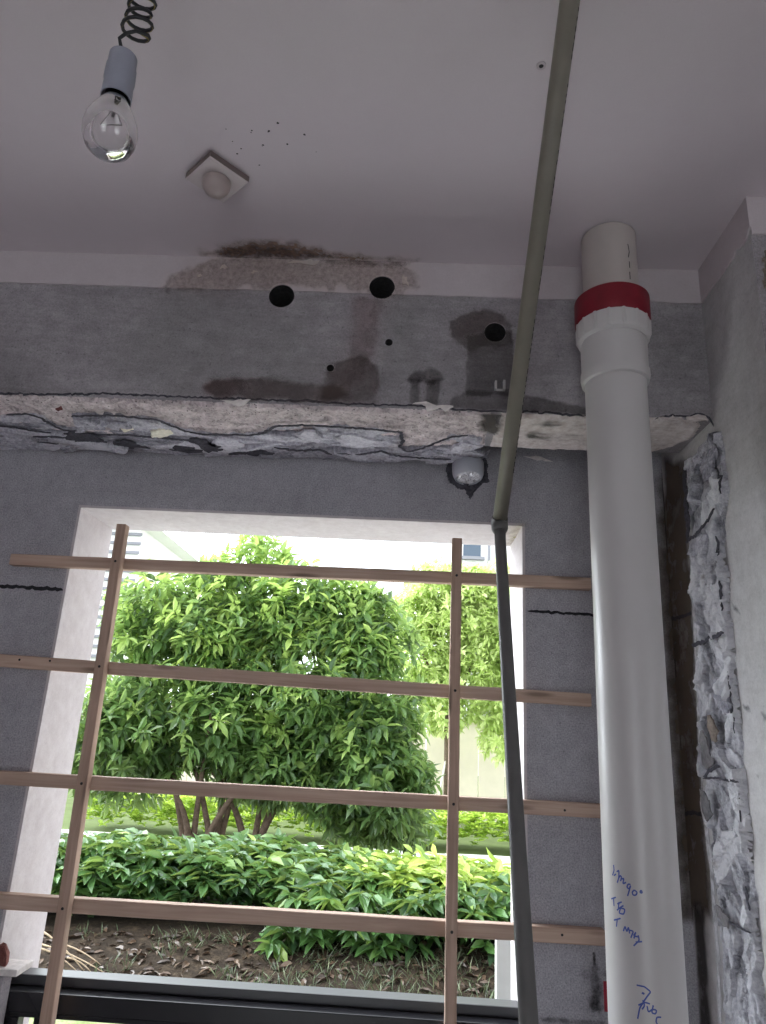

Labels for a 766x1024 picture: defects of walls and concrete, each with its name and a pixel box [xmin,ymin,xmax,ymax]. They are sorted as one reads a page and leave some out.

water stain [208,358,377,400]
spalling [0,392,506,499]
spalling [517,410,587,462]
crack [0,584,63,592]
crack [528,609,593,617]
flaking render [649,413,766,1024]